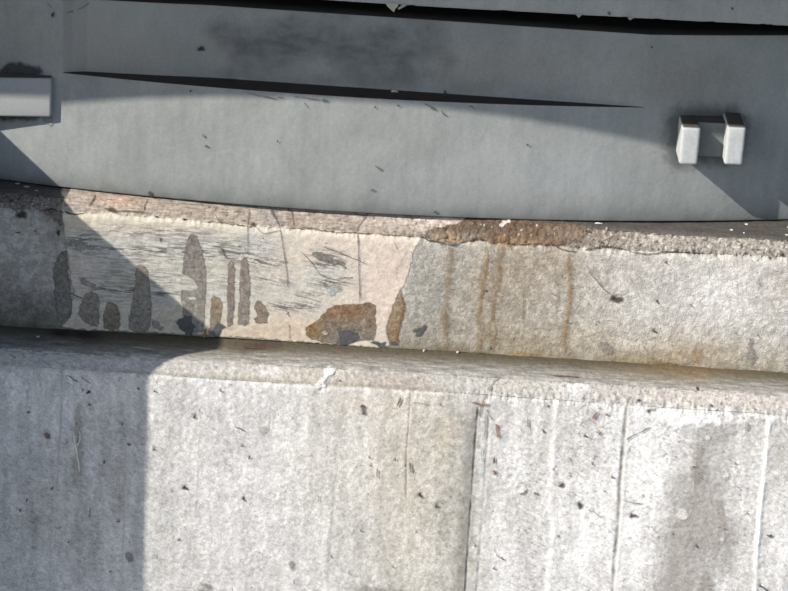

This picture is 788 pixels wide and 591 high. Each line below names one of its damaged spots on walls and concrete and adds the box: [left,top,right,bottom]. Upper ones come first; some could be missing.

rust [424,218,587,247]
peeling [61,188,522,348]
leakage [656,403,725,430]